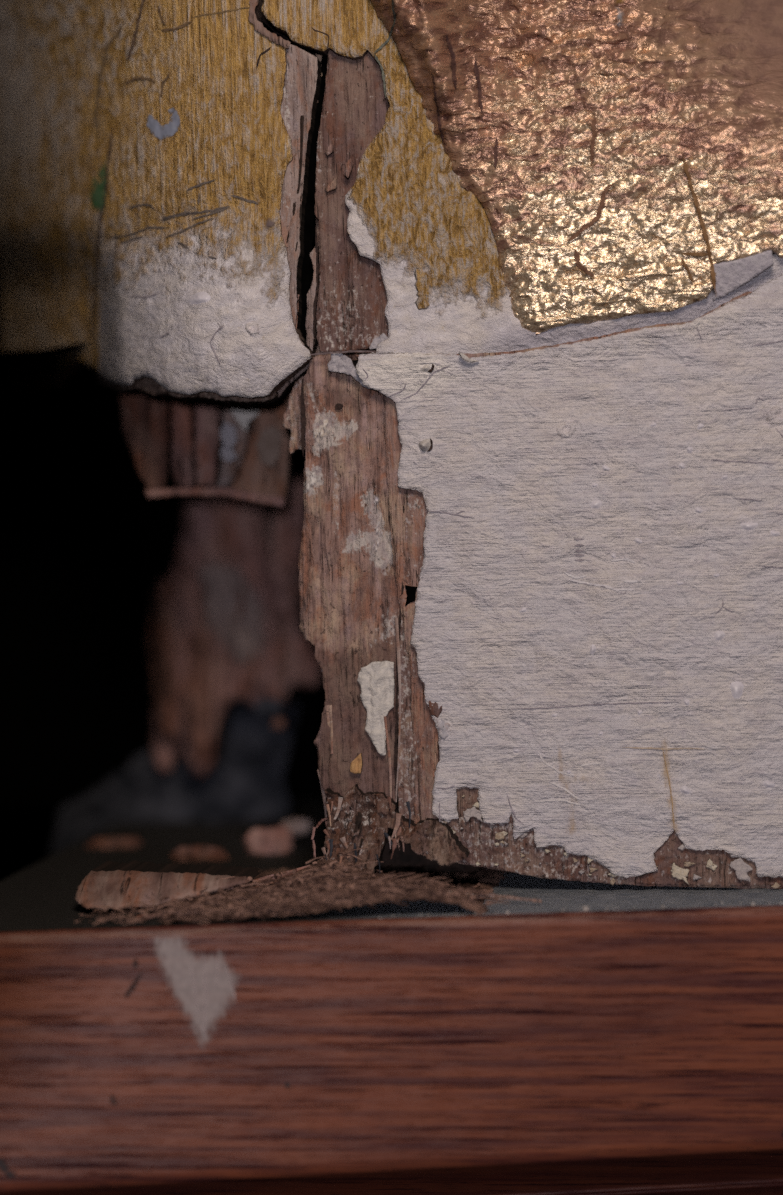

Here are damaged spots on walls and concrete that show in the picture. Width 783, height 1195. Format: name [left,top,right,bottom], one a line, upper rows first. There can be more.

crack [92,0,329,331]
crack [373,0,396,98]
spalling [0,44,783,889]